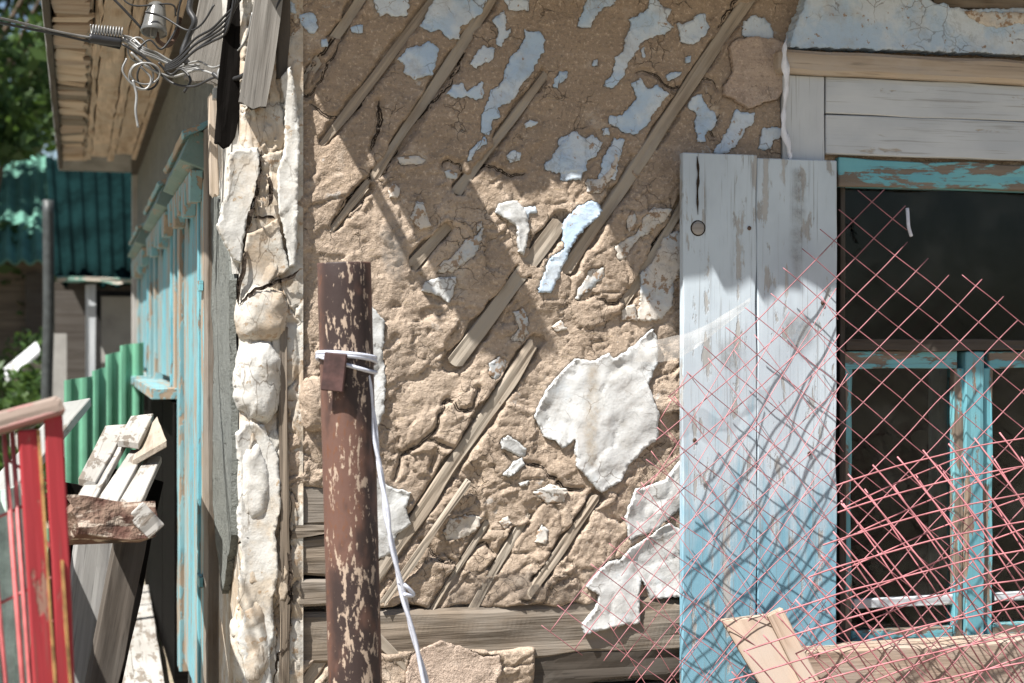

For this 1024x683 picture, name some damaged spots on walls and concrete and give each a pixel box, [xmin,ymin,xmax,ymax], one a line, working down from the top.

flaking render [216,67,301,300]
crack [237,150,299,305]
crack [303,38,398,217]
crack [415,53,465,123]
crack [442,160,525,178]
peeling [537,0,710,293]
crack [650,157,700,250]
crack [639,71,717,89]
flaking render [688,0,1024,154]
flaking render [372,307,386,426]
flaking render [534,207,680,493]
flaking render [581,460,680,634]